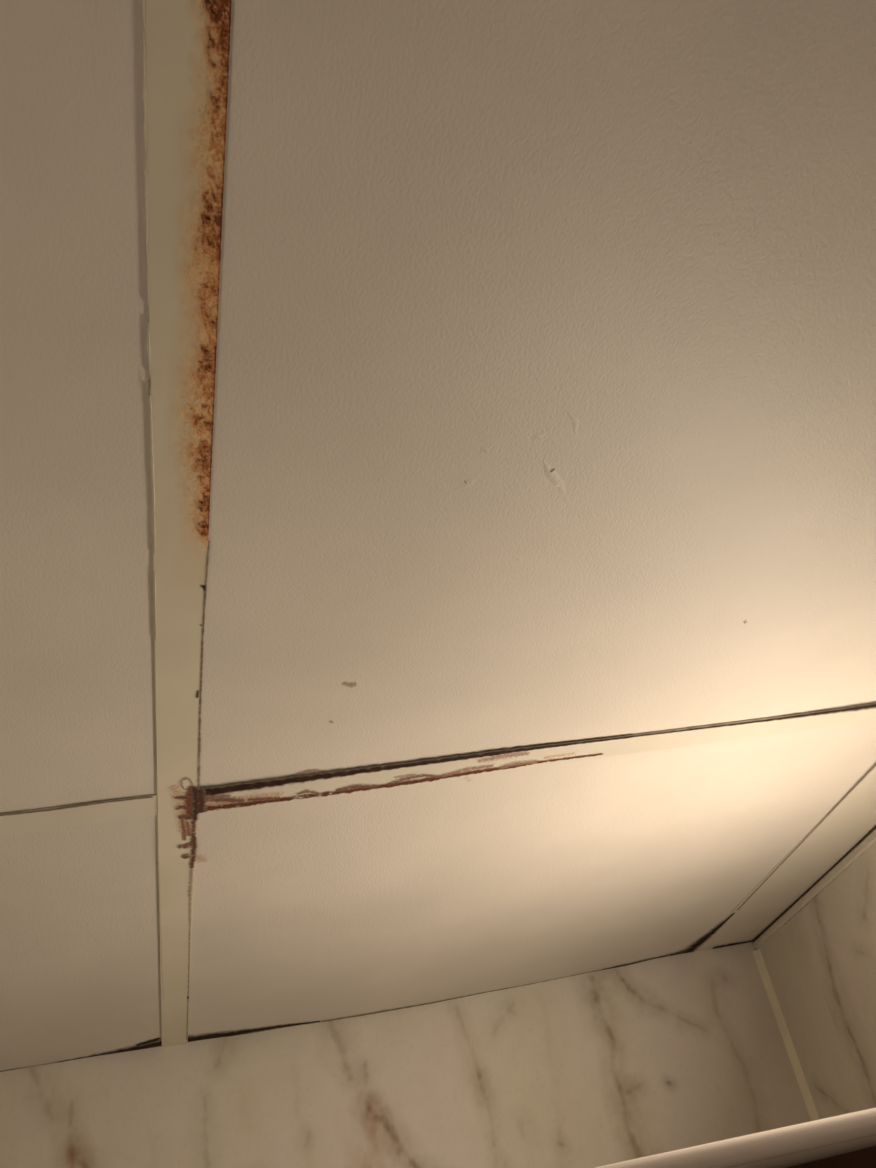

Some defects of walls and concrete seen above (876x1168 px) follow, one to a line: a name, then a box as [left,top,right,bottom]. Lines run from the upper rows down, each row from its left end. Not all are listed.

rust [180,0,232,547]
rust [175,736,634,868]